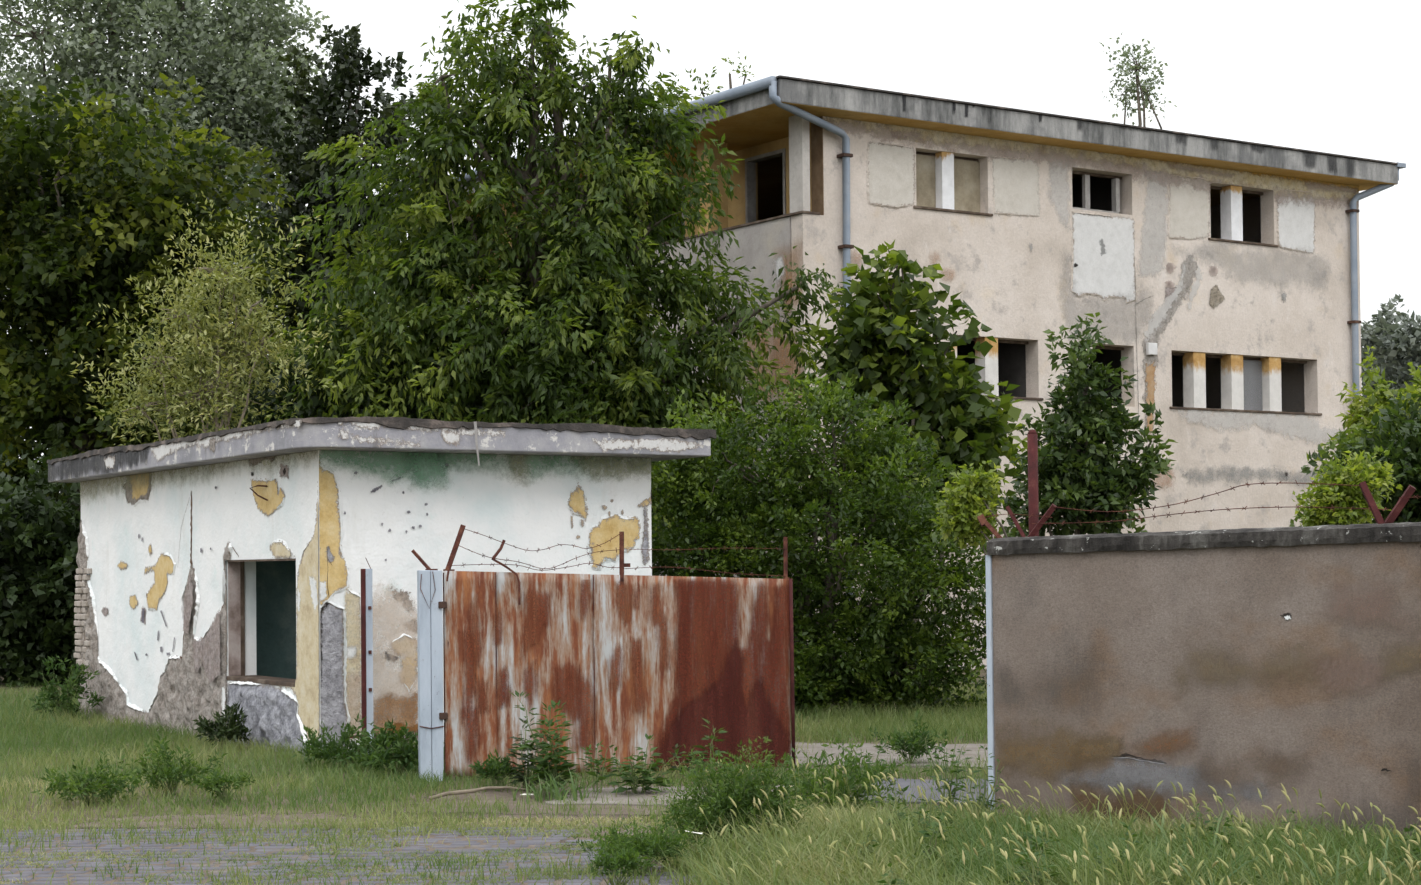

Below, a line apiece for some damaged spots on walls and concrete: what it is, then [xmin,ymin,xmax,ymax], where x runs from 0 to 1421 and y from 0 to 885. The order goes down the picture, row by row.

peeling [104,420,302,507]
peeling [565,482,652,571]
spalling [74,453,361,758]
peeling [385,586,418,693]
rust [461,591,593,763]
rust [580,580,590,616]
rust [611,578,790,771]